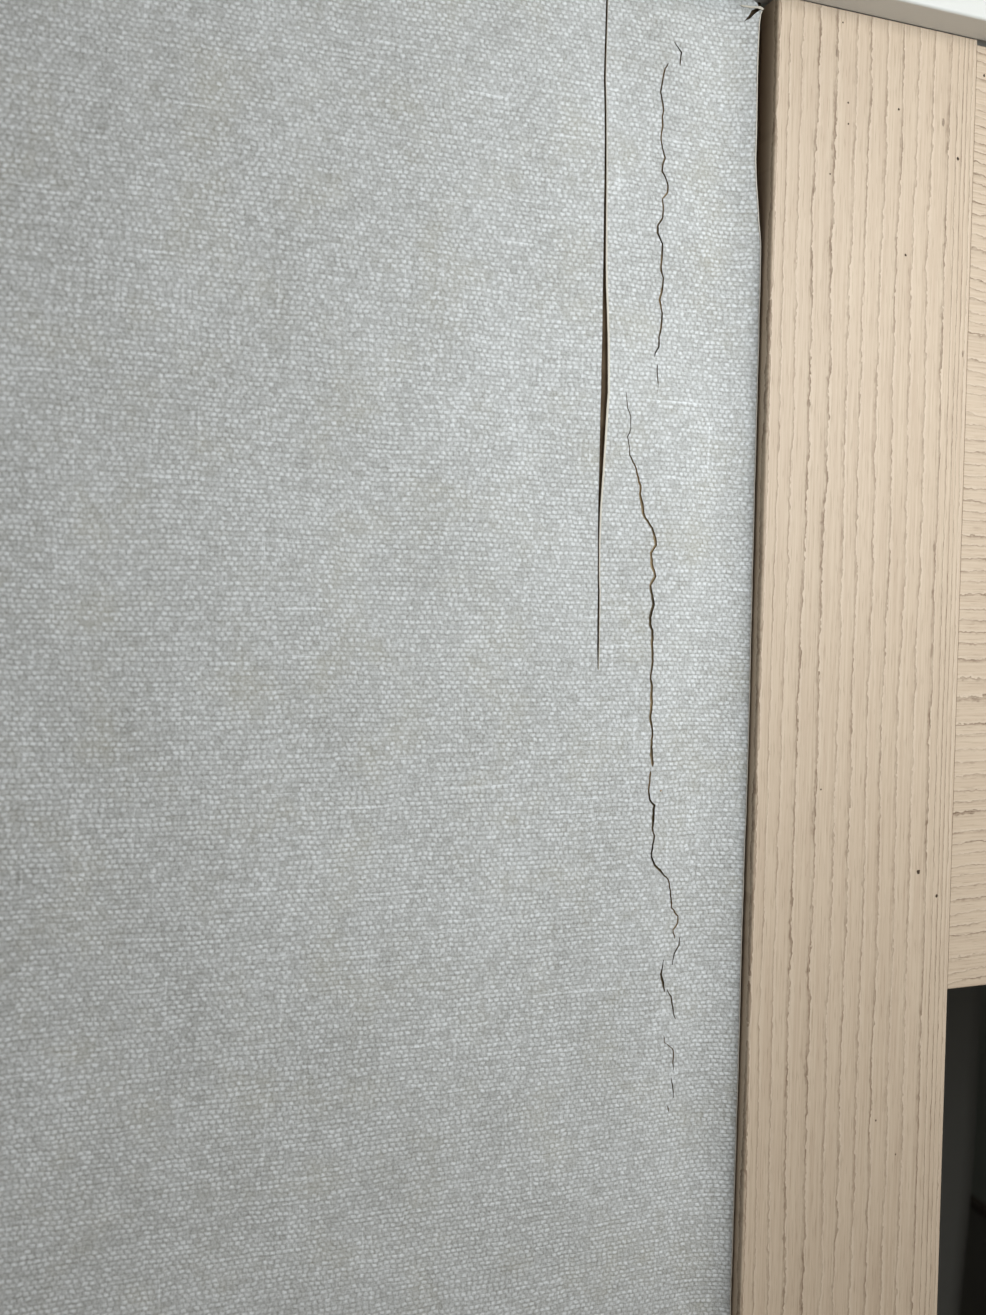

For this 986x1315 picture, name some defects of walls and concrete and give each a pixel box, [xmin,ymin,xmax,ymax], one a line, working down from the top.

crack [626,43,682,1112]